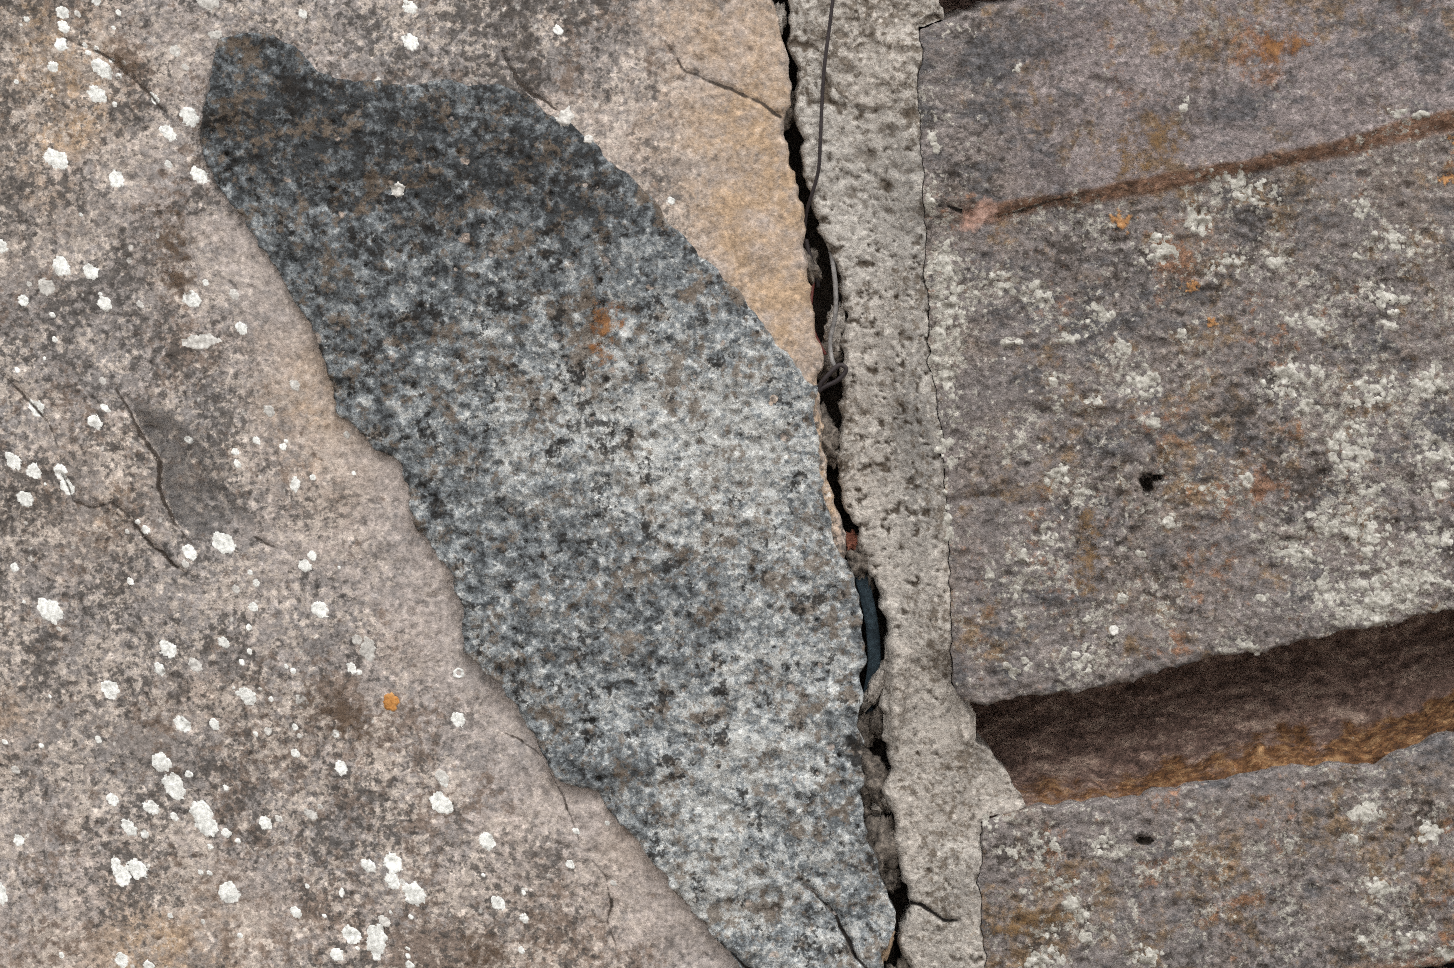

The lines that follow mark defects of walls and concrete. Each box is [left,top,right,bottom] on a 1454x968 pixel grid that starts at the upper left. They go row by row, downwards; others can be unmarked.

crack [667,0,958,968]
crack [1426,960,1454,968]